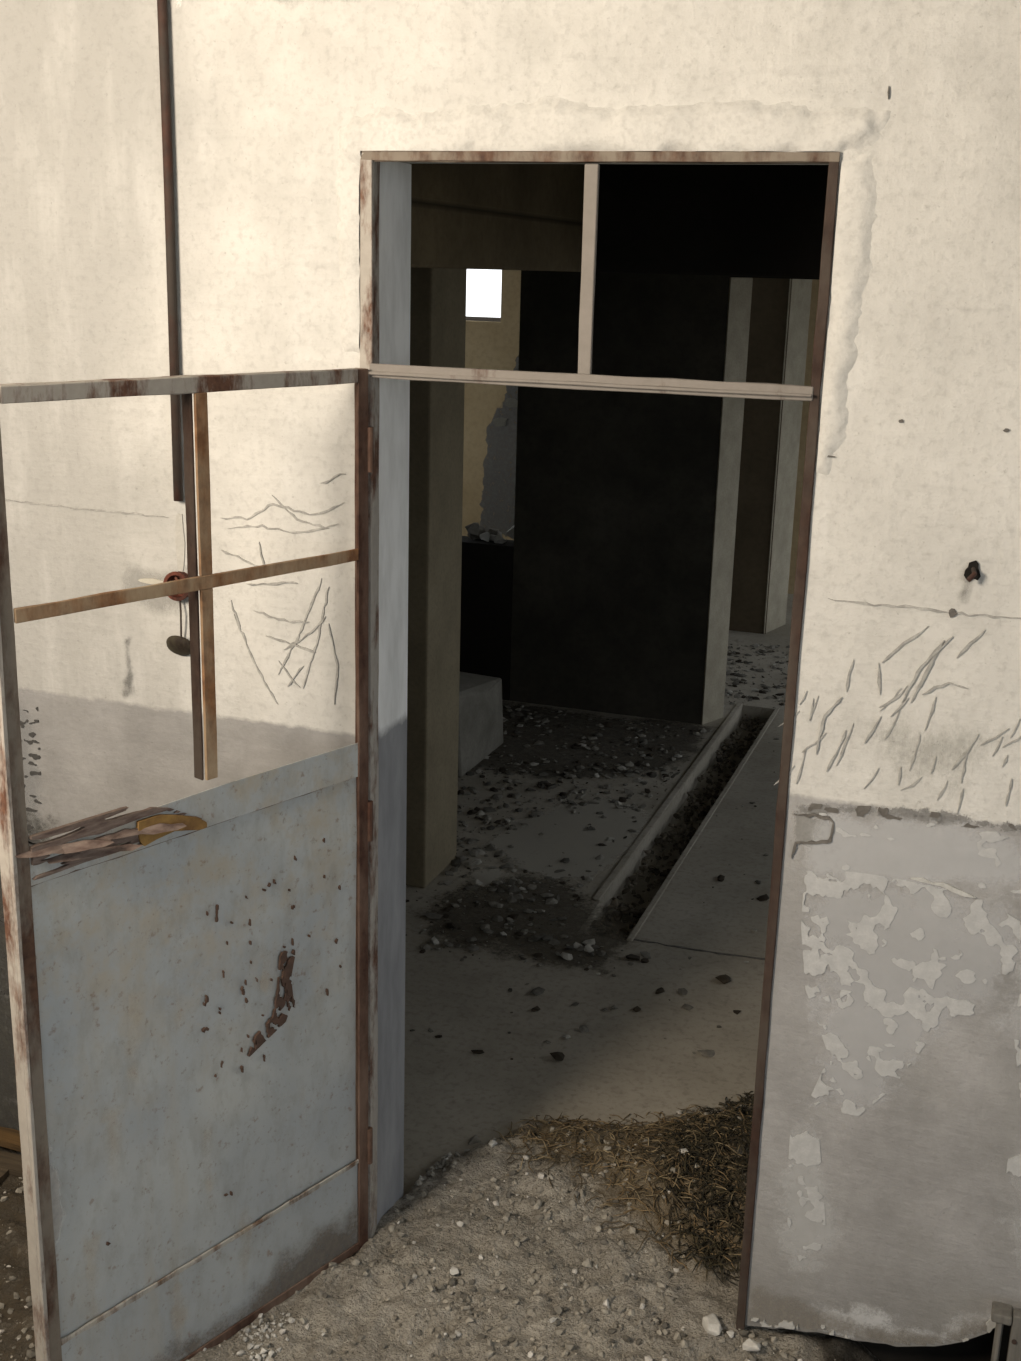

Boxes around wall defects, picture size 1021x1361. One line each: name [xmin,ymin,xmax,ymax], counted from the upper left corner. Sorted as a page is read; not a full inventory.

peeling [480,356,519,536]
peeling [20,707,42,845]
peeling [793,803,1021,1116]
peeling [787,1131,826,1228]
peeling [1006,1154,1021,1177]
spalling [751,1291,996,1345]